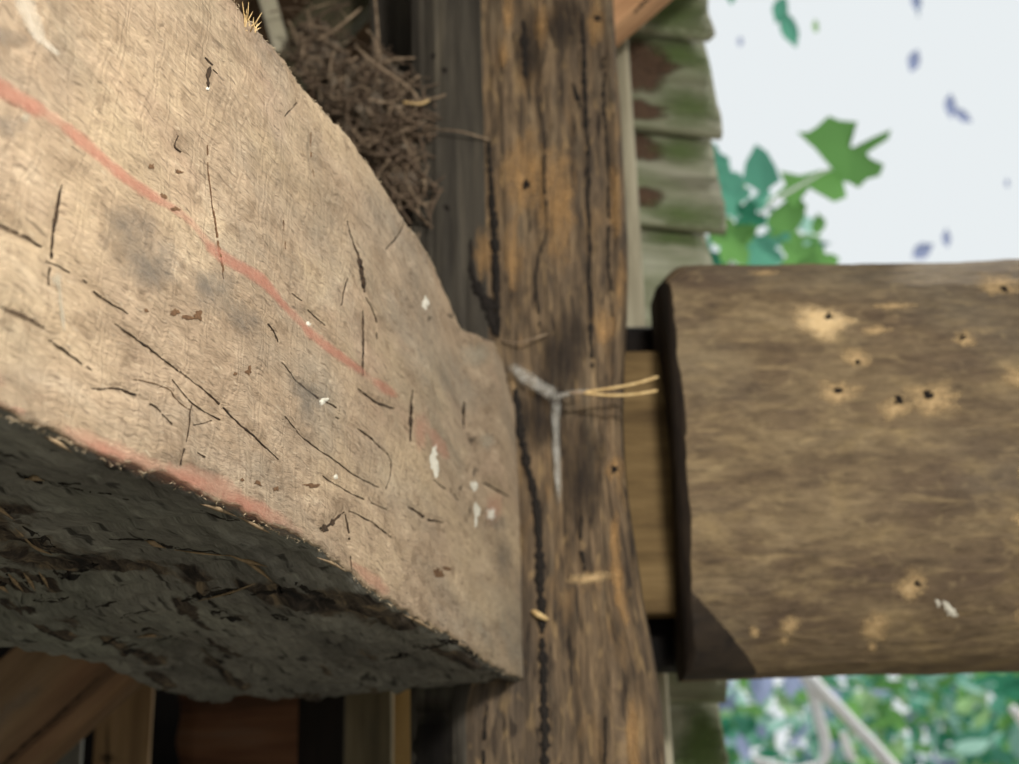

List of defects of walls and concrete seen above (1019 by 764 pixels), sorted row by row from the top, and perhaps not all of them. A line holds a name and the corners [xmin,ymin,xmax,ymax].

crack [0,184,279,465]
crack [207,145,224,279]
crack [267,323,443,569]
crack [341,221,413,442]
crack [459,401,467,428]
crack [468,141,501,337]